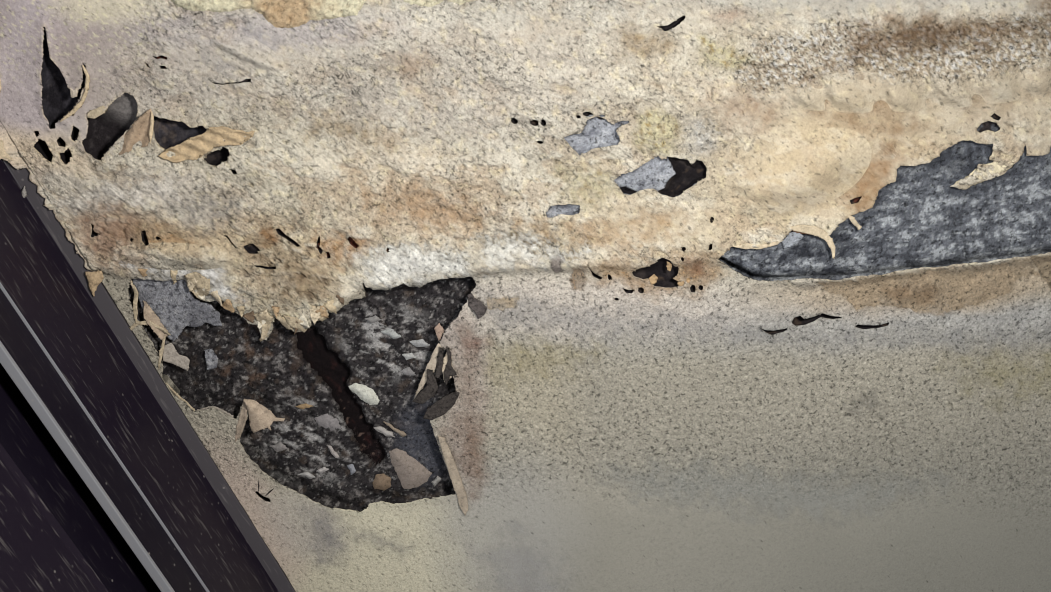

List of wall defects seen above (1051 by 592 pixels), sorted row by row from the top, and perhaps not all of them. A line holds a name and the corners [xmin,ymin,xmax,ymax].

peeling [60,65,107,122]
spalling [564,112,629,155]
spalling [614,156,707,197]
spalling [709,113,1051,312]
peeling [551,254,612,290]
peeling [615,247,686,300]
spalling [128,268,519,516]